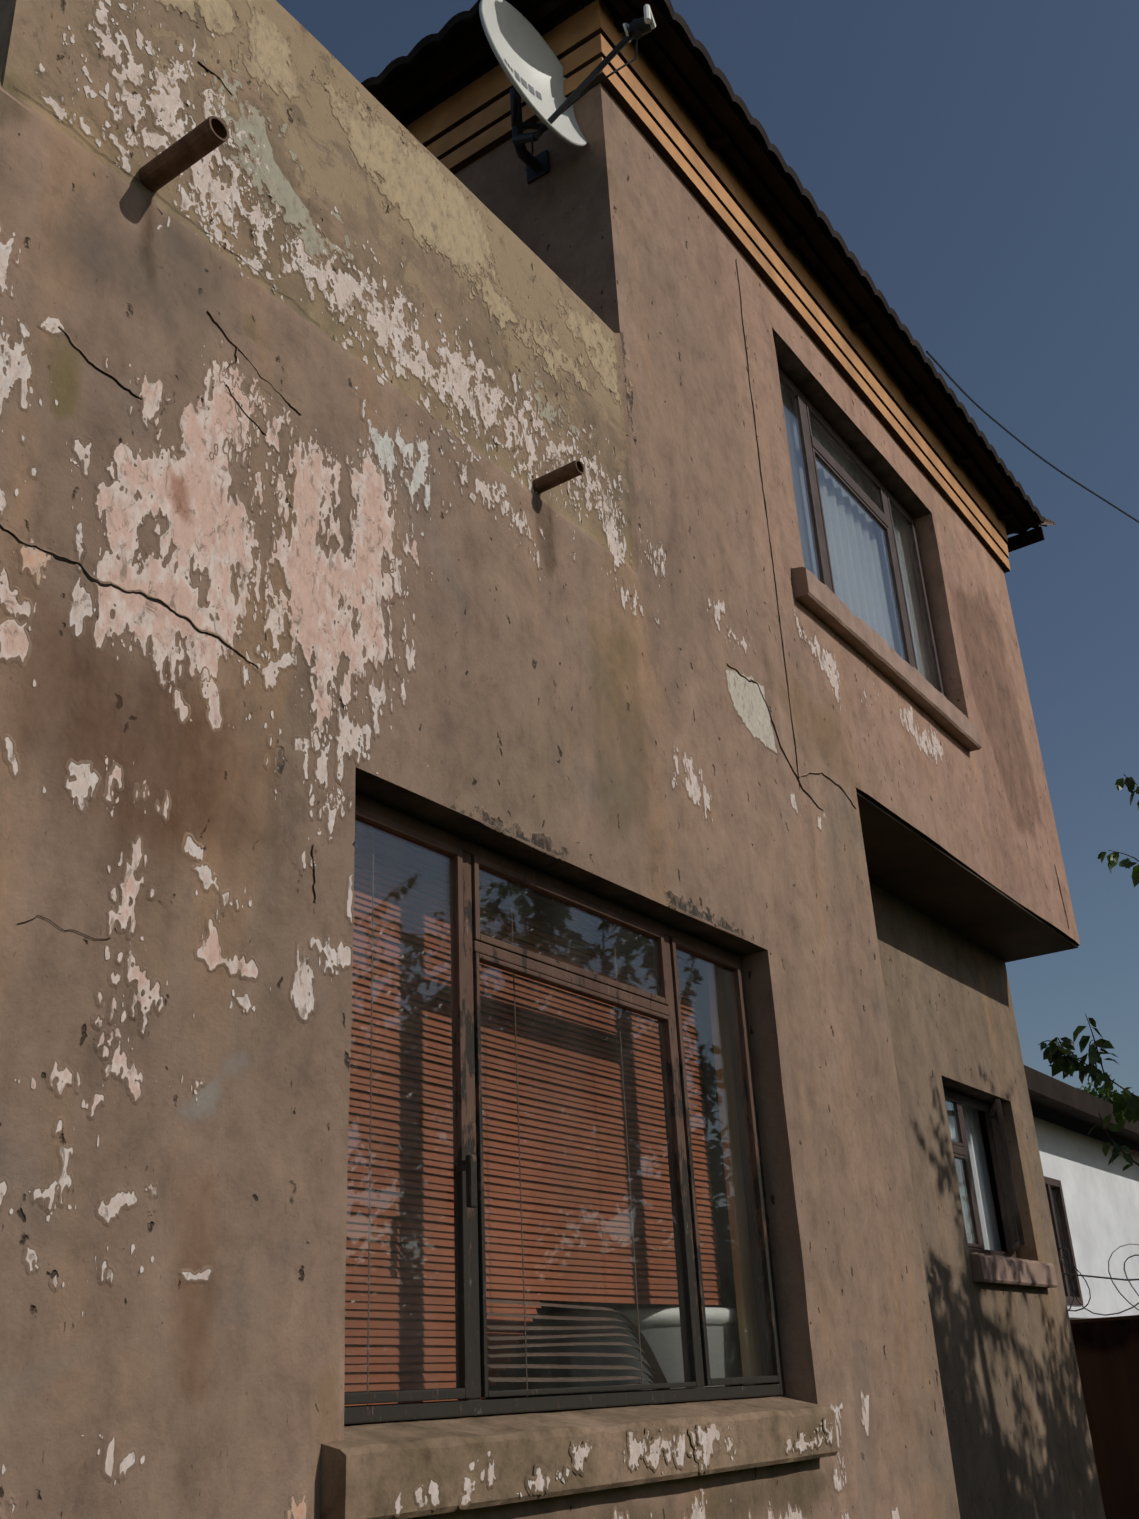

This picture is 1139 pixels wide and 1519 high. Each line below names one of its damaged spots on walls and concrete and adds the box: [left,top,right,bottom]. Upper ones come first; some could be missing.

peeling [0,314,67,445]
crack [58,326,142,400]
crack [207,311,302,436]
peeling [36,0,667,871]
peeling [0,535,55,687]
crack [0,522,259,669]
peeling [707,596,778,756]
crack [727,260,856,810]
peeling [15,834,206,1228]
peeling [388,1451,497,1517]
peeling [517,1440,592,1497]
peeling [623,1421,736,1519]